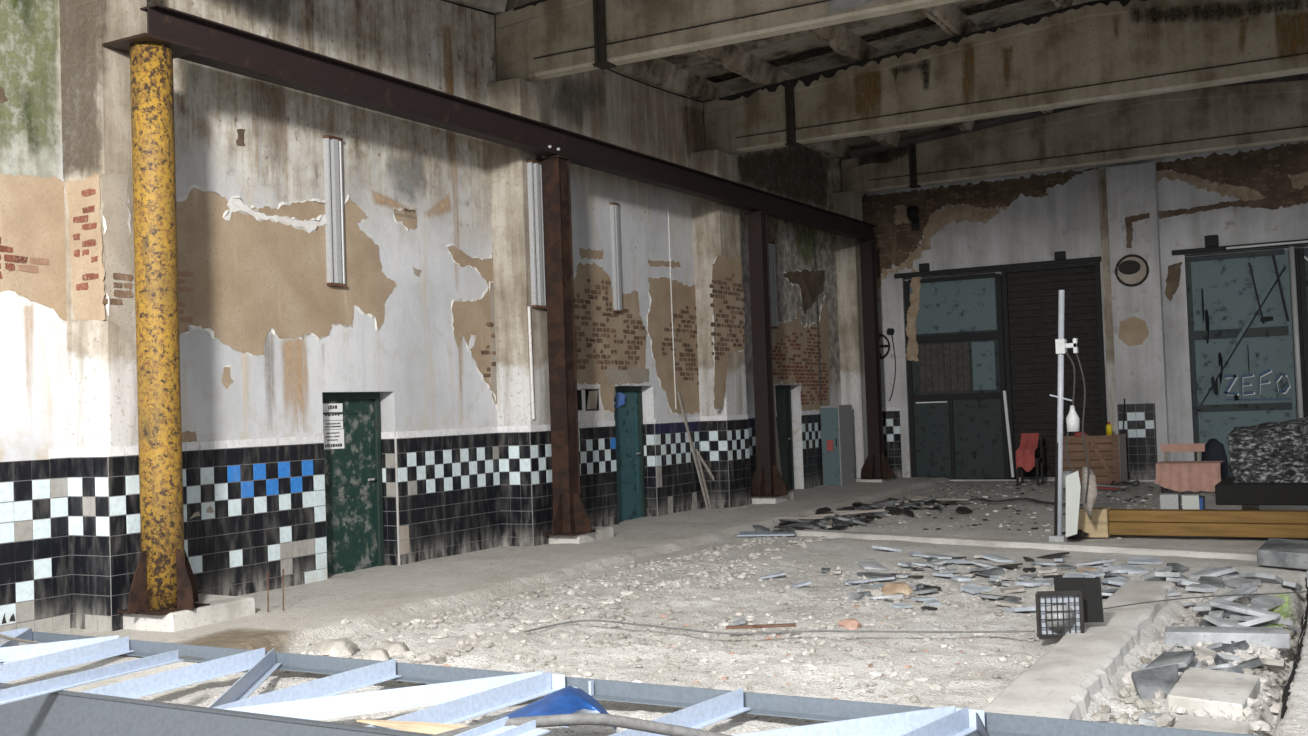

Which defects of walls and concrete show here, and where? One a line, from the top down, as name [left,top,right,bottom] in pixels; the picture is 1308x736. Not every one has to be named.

flaking render [1150,141,1308,208]
peeling [0,173,134,349]
peeling [176,185,397,390]
peeling [573,247,746,416]
peeling [771,268,830,411]
flaking render [862,168,1098,361]
spalling [1165,262,1182,301]